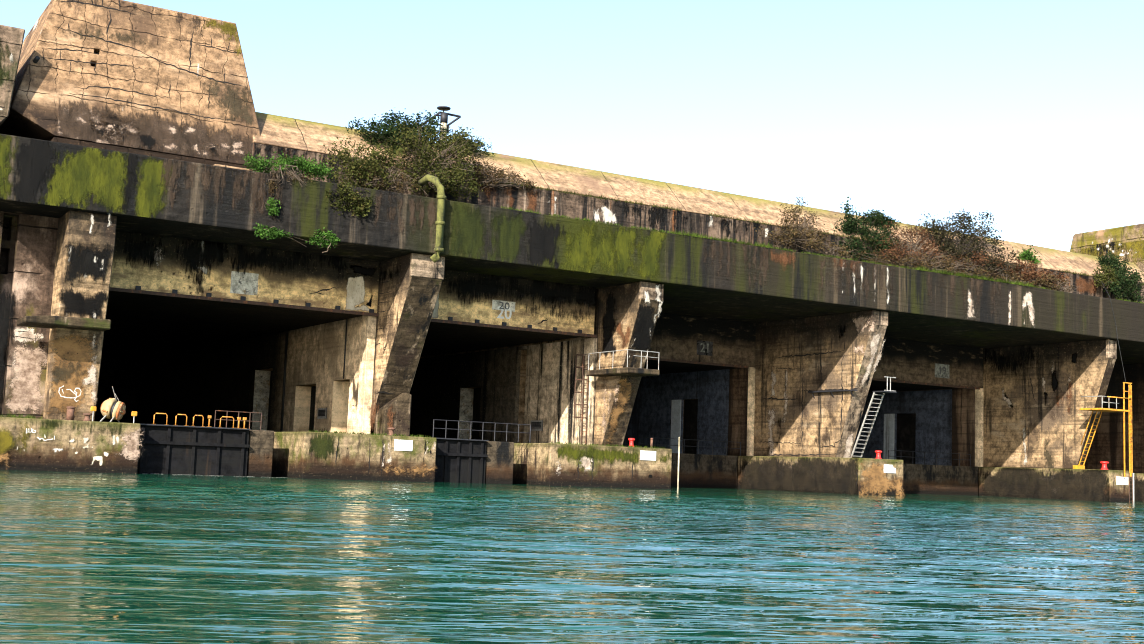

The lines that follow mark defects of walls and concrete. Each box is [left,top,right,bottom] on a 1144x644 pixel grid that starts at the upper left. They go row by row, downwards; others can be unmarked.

crack [42,0,242,121]
water stain [14,138,58,203]
water stain [108,153,138,226]
peeling [58,106,243,156]
water stain [161,158,284,221]
water stain [254,144,333,169]
water stain [374,192,437,238]
water stain [594,205,768,286]
water stain [818,258,893,303]
spalling [632,303,655,351]
peeling [3,327,47,414]